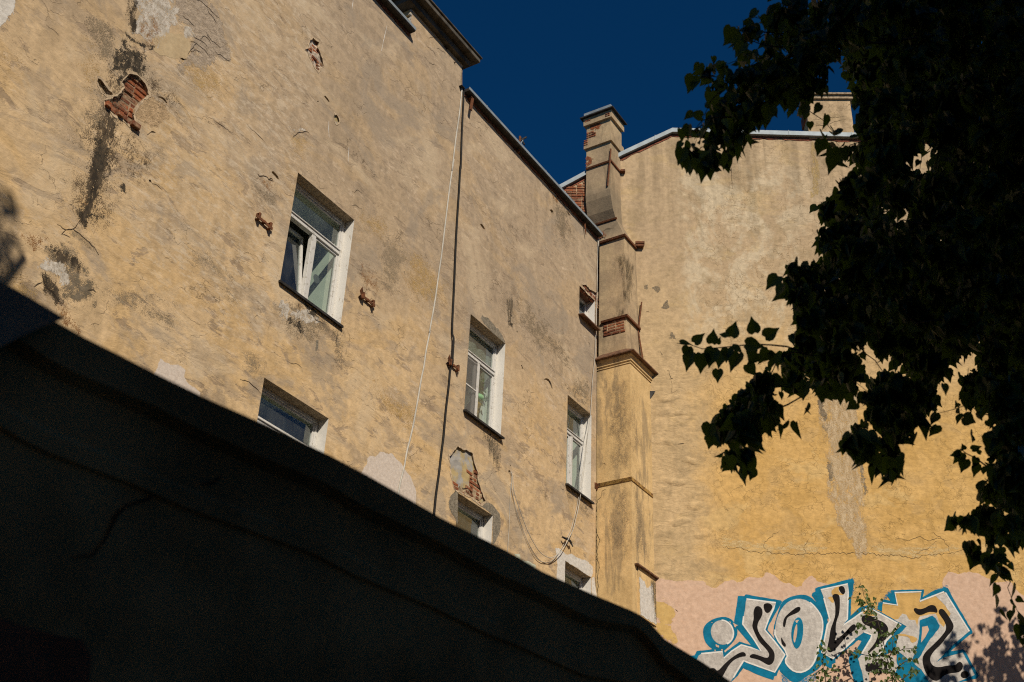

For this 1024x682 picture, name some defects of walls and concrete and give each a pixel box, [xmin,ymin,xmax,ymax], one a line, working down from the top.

water stain [59,0,195,233]
spalling [97,71,170,135]
crack [57,222,99,255]
spalling [448,445,486,506]
crack [721,532,963,559]